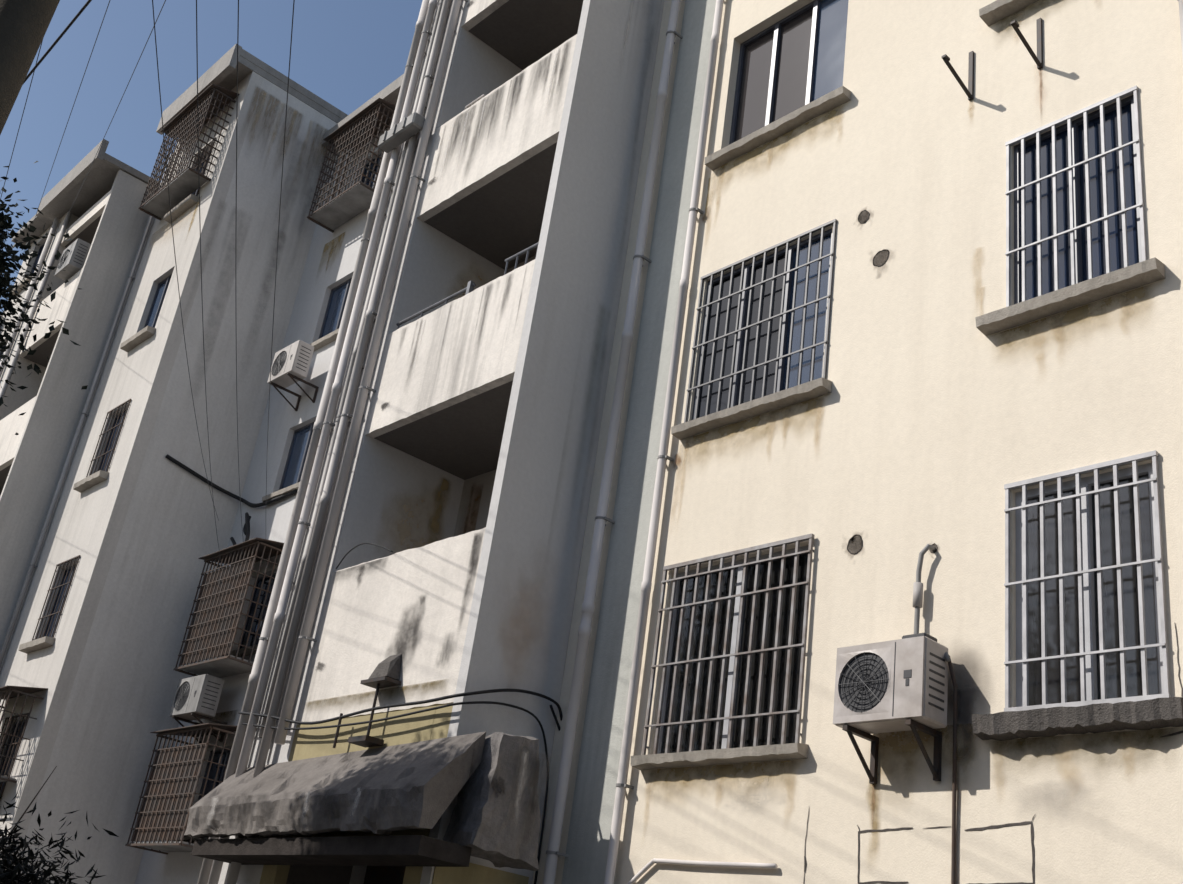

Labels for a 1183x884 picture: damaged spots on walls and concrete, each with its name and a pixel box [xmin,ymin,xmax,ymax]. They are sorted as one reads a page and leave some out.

leakage [446,74,522,152]
leakage [471,535,481,571]